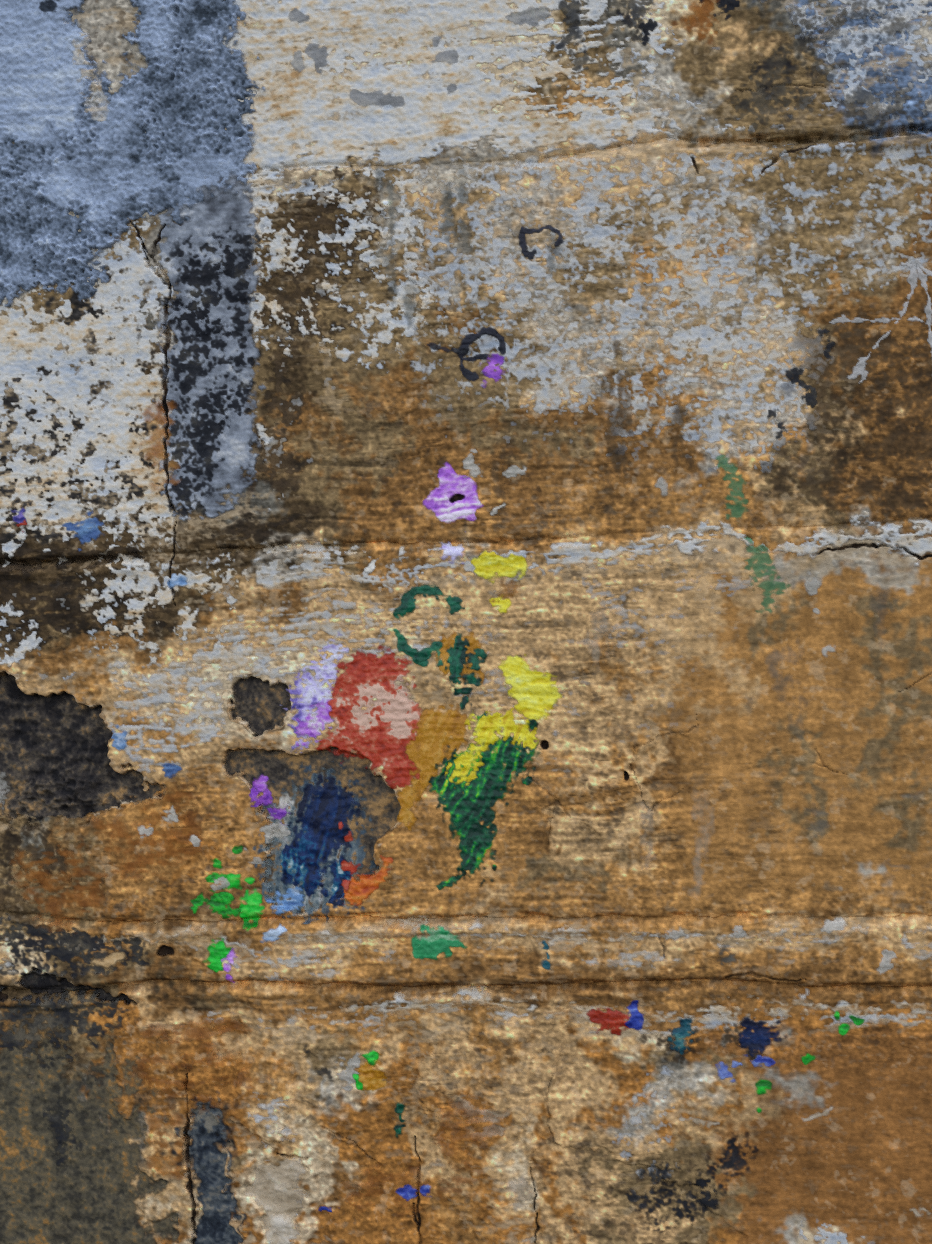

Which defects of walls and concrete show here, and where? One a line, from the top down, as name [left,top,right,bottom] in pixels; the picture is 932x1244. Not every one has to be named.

crack [130,221,166,254]
crack [163,282,177,594]
peeling [493,511,932,580]
peeling [0,219,587,981]
peeling [587,933,663,966]